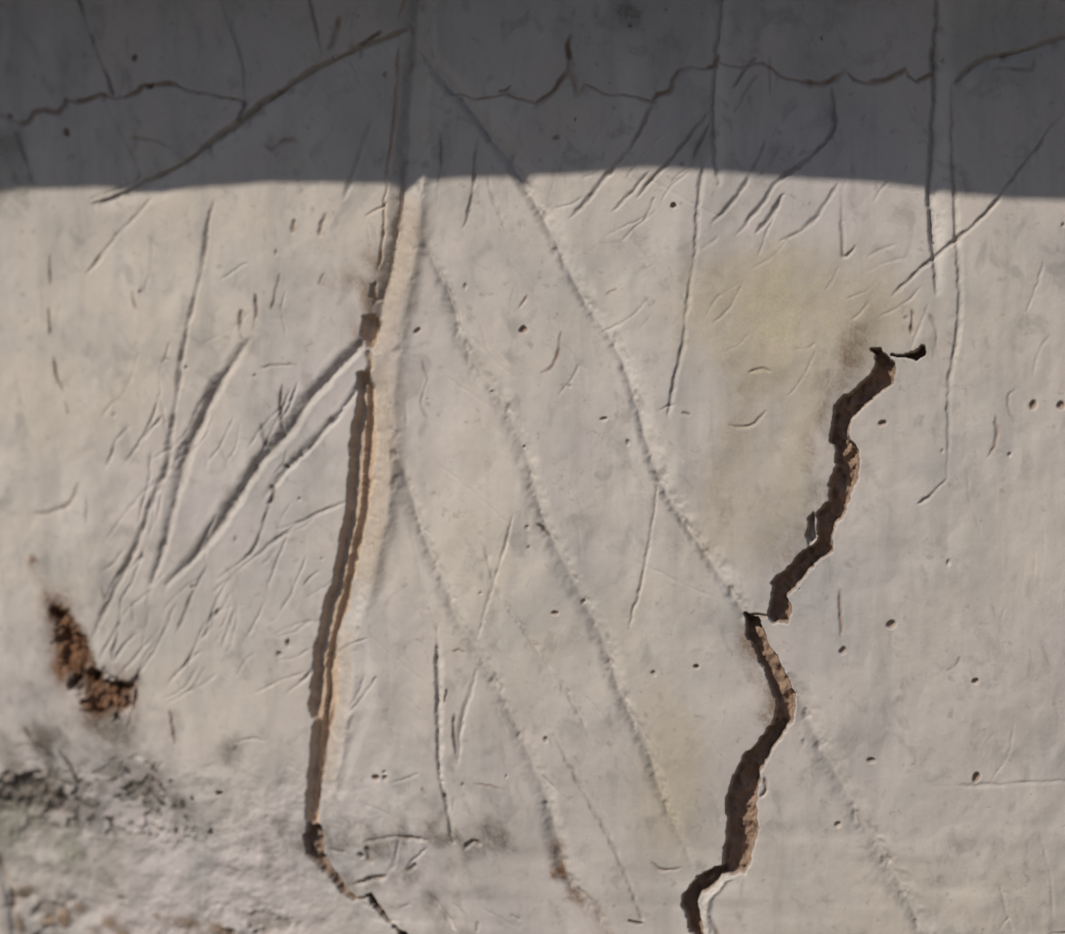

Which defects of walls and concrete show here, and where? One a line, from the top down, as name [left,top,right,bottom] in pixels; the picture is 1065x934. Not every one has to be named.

crack [0,80,248,126]
crack [449,35,934,105]
crack [302,48,408,934]
spalling [46,597,140,721]
crack [681,310,926,934]
crack [430,895,457,931]